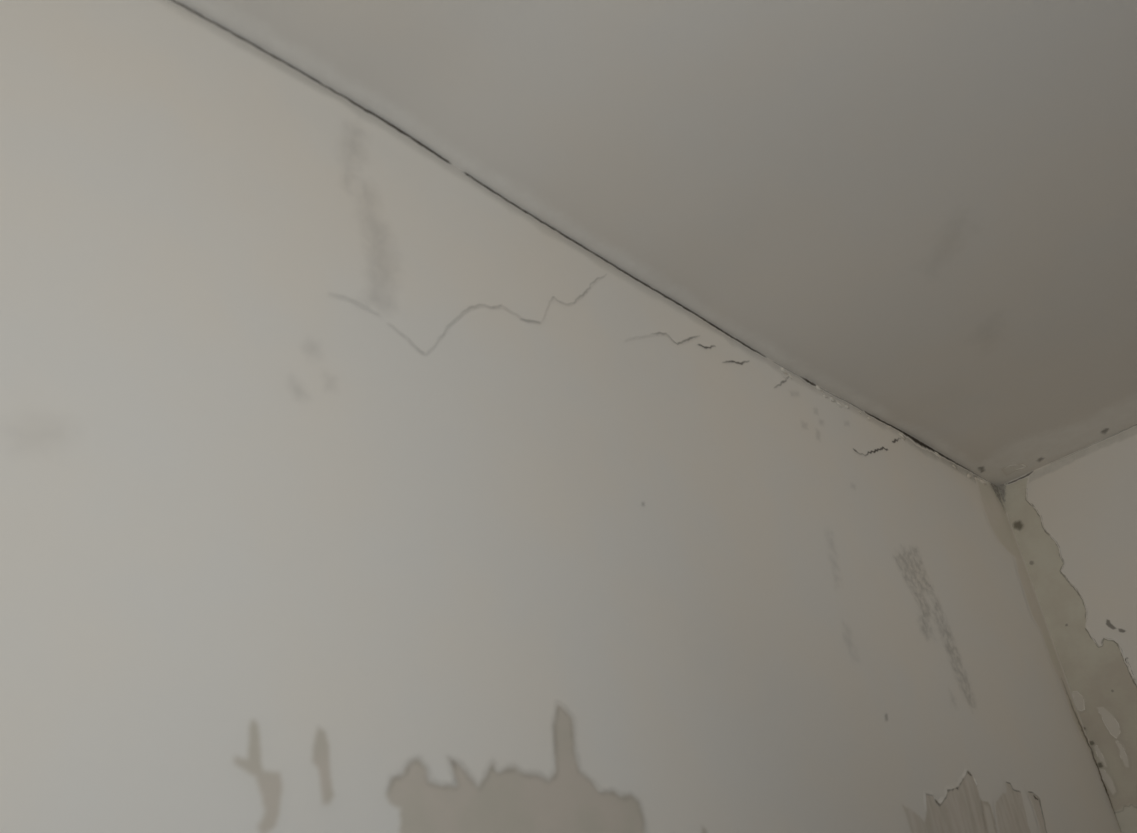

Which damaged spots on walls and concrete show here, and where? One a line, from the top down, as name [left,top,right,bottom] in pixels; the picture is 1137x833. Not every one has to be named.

crack [167,0,1137,485]
peeling [975,477,1137,833]
peeling [228,714,288,833]
peeling [307,721,339,810]
peeling [381,699,647,833]
peeling [899,766,1048,833]